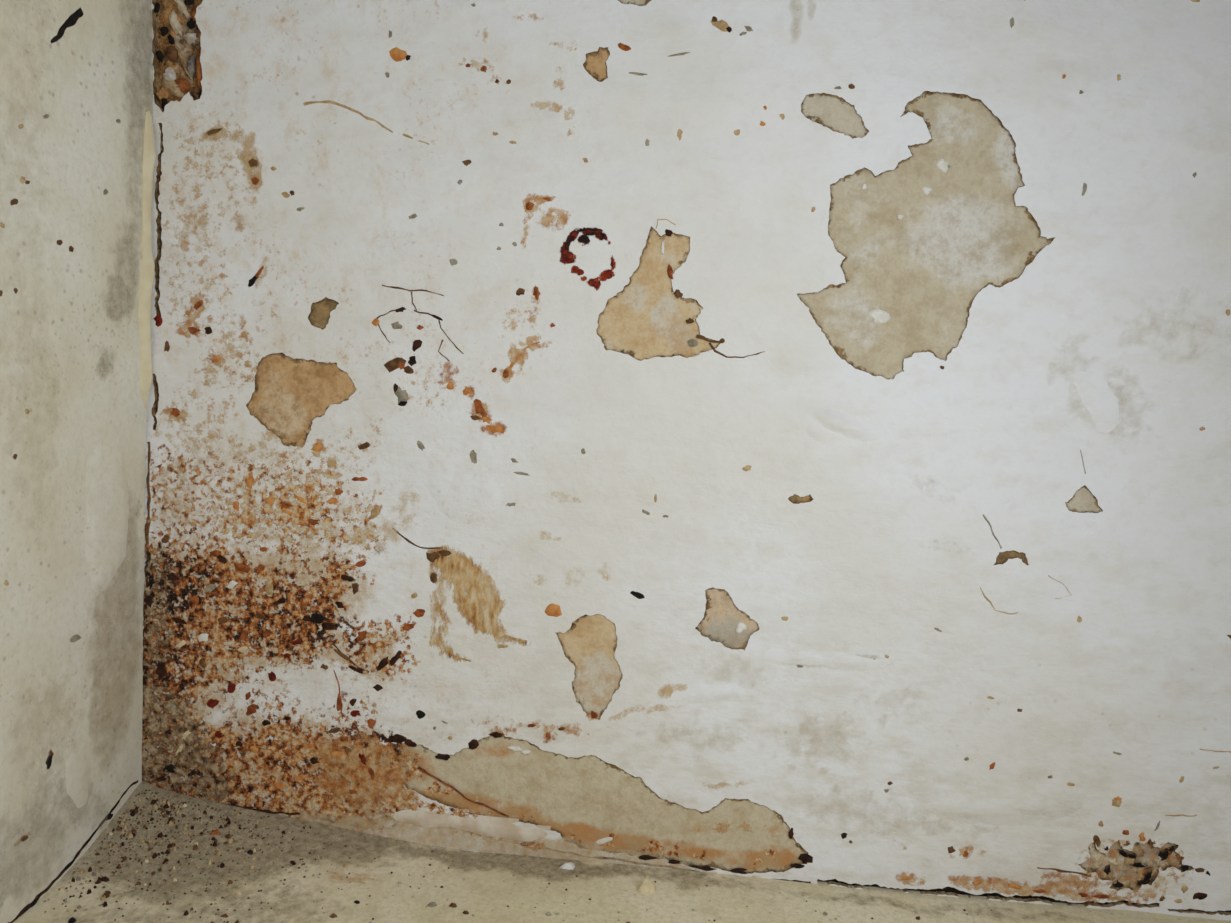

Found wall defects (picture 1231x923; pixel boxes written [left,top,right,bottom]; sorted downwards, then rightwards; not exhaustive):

flaking render [152,0,203,112]
corrosion [521,194,616,291]
peeling [596,219,765,361]
peeling [797,91,1055,380]
peeling [246,353,357,447]
corrosion [142,123,551,850]
peeling [555,614,623,720]
peeling [695,587,759,650]
peeling [382,731,813,874]
corrosion [897,873,925,885]
corrosion [949,872,1147,904]
flaking render [1037,814,1210,903]